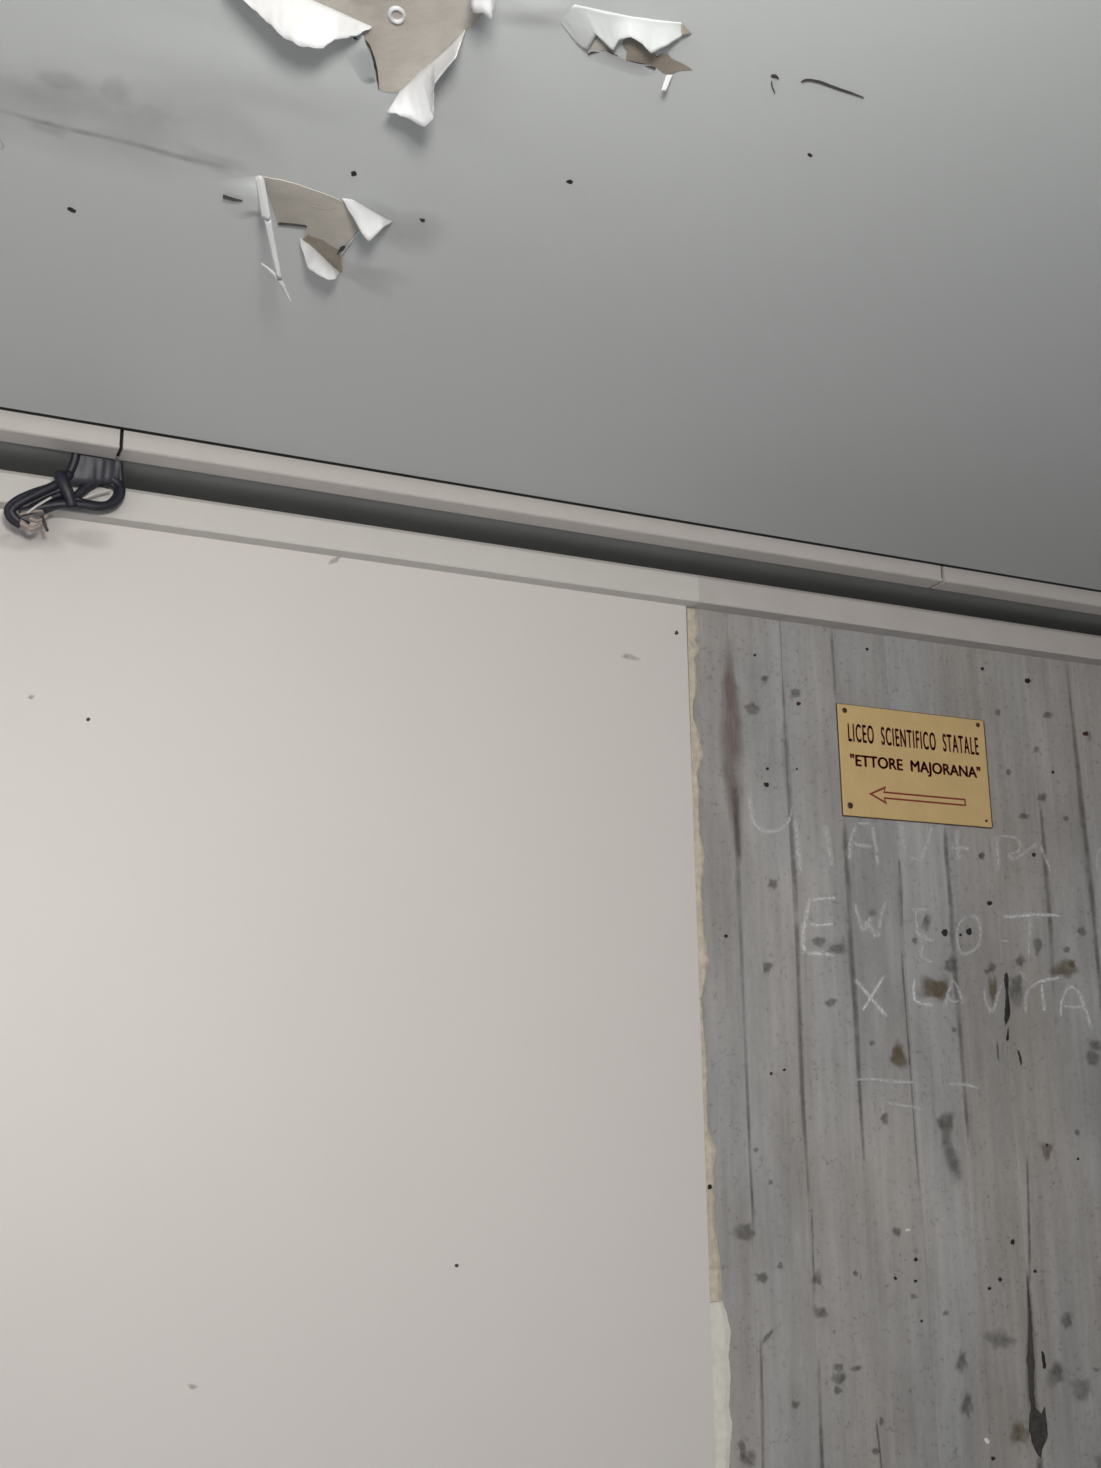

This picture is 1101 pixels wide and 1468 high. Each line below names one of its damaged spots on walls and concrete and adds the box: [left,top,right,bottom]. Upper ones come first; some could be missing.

peeling [243,0,495,127]
peeling [561,5,692,91]
peeling [217,175,392,302]